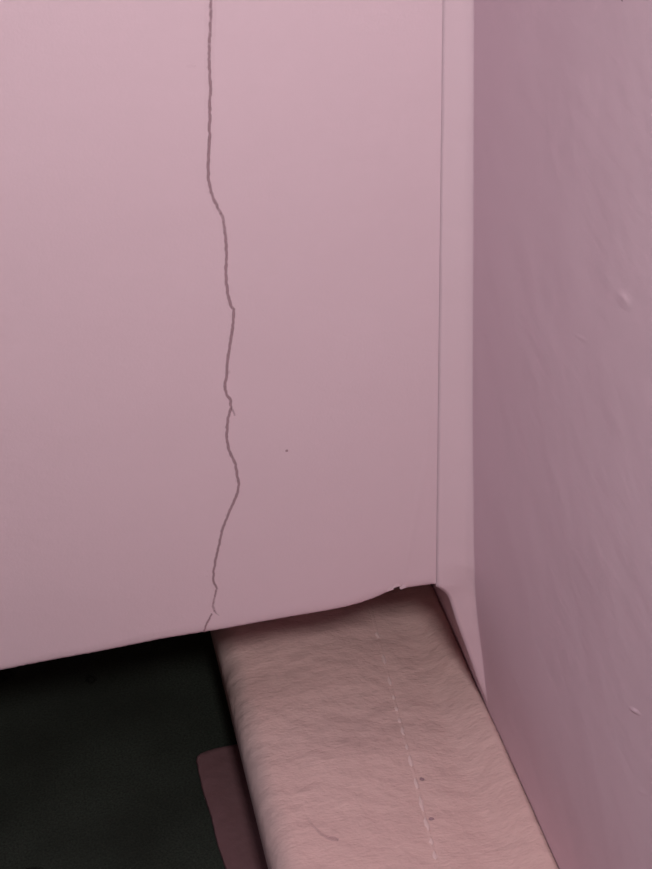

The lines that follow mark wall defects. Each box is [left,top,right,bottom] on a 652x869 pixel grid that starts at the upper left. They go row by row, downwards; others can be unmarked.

crack [186,0,243,632]